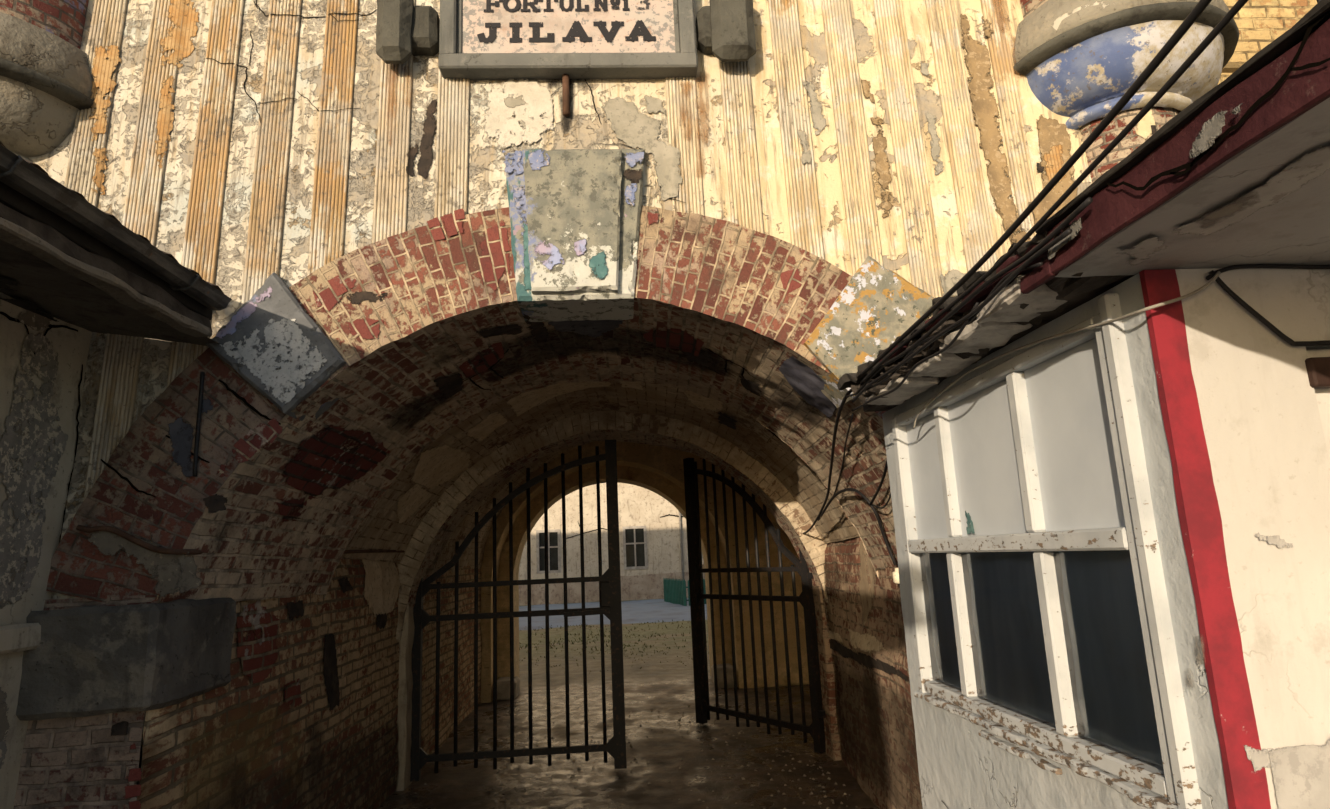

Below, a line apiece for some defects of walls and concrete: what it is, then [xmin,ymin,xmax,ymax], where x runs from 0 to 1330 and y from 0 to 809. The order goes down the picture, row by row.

peeling [89,45,122,195]
peeling [154,0,199,168]
crack [203,0,377,123]
peeling [624,152,672,224]
spalling [797,80,826,164]
spalling [860,78,893,218]
spalling [960,14,1078,245]
crack [0,311,78,355]
flaking render [313,275,387,339]
flaking render [427,149,608,399]
peeling [0,278,68,609]
crack [59,364,156,543]